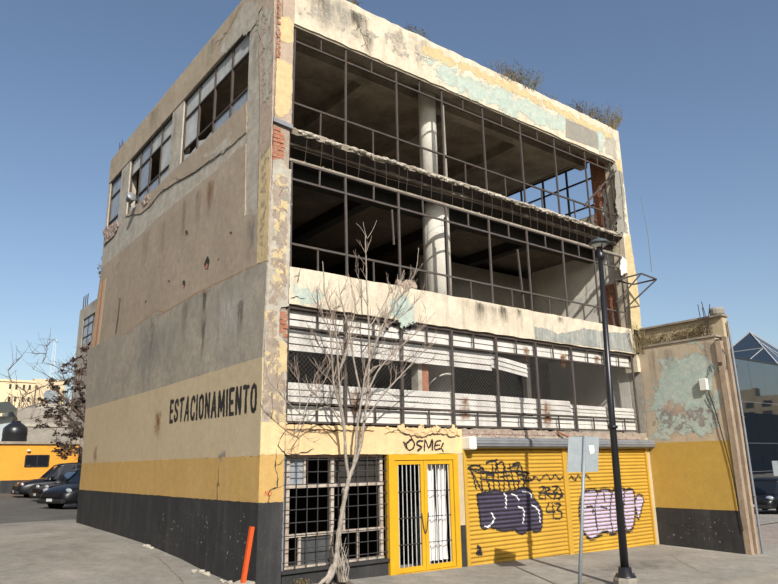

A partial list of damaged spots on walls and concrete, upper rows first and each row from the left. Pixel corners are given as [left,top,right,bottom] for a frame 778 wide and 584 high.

flaking render [219,0,281,105]
peeling [299,6,613,153]
flaking render [103,220,119,245]
flaking render [258,126,633,425]
peeling [386,302,723,441]
crack [241,428,355,563]